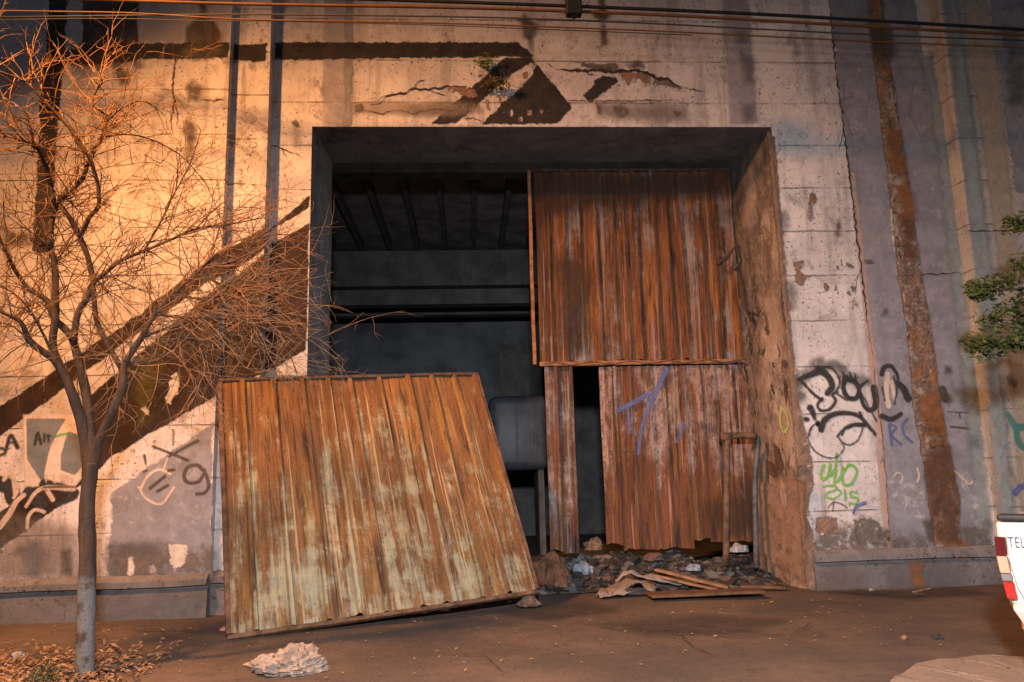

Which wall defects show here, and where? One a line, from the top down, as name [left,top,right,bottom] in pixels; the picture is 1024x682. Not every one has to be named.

crack [371,79,471,105]
crack [547,63,699,114]
spalling [620,72,682,91]
rust [889,131,916,261]
crack [828,0,892,547]
rust [926,449,967,560]